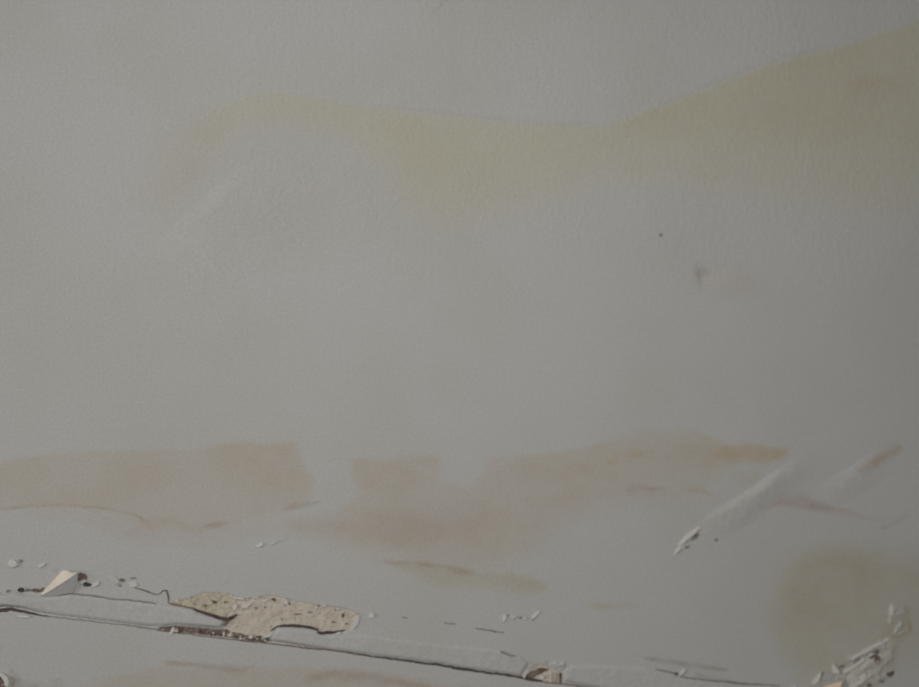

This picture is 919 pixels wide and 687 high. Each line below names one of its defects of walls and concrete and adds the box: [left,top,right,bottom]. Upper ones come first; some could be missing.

peeling [6,563,99,596]
spalling [158,593,374,642]